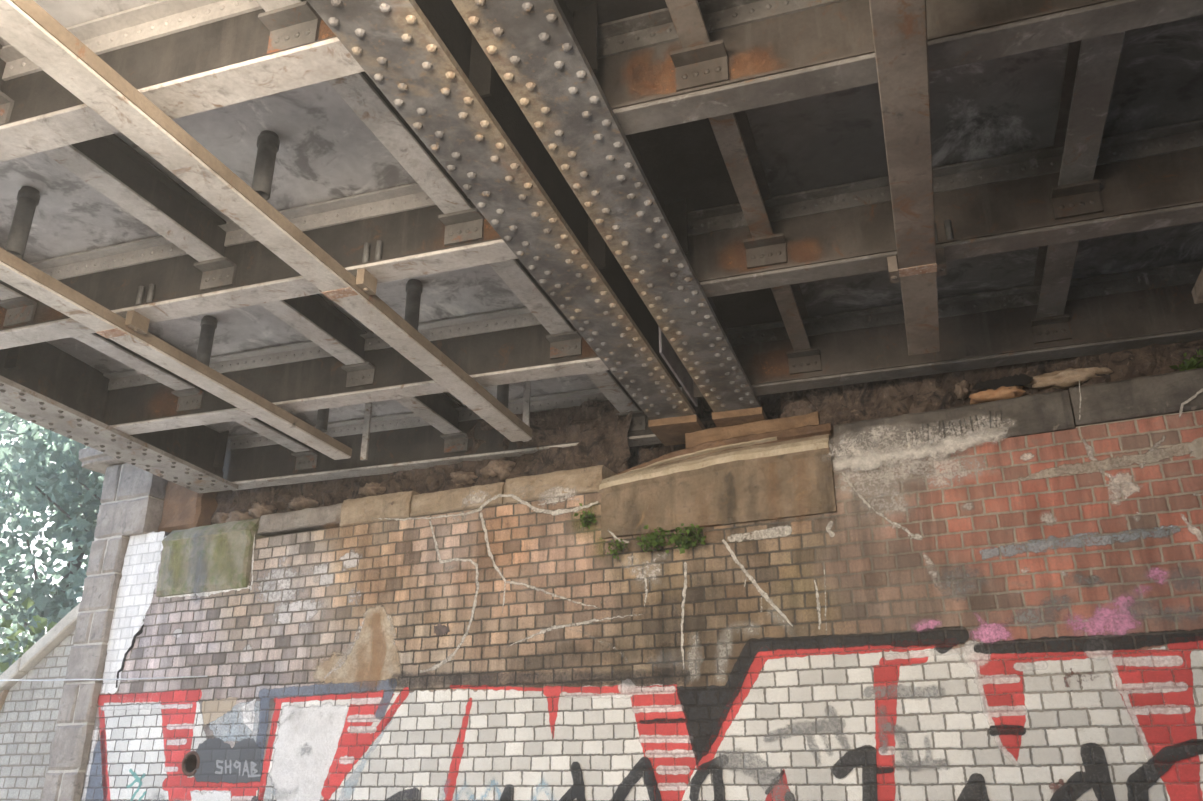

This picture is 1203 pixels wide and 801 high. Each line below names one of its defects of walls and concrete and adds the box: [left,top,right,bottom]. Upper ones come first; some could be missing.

crack [1179,389,1203,418]
leakage [829,416,1005,512]
peeling [101,531,361,694]
crack [378,494,641,673]
crack [722,539,793,627]